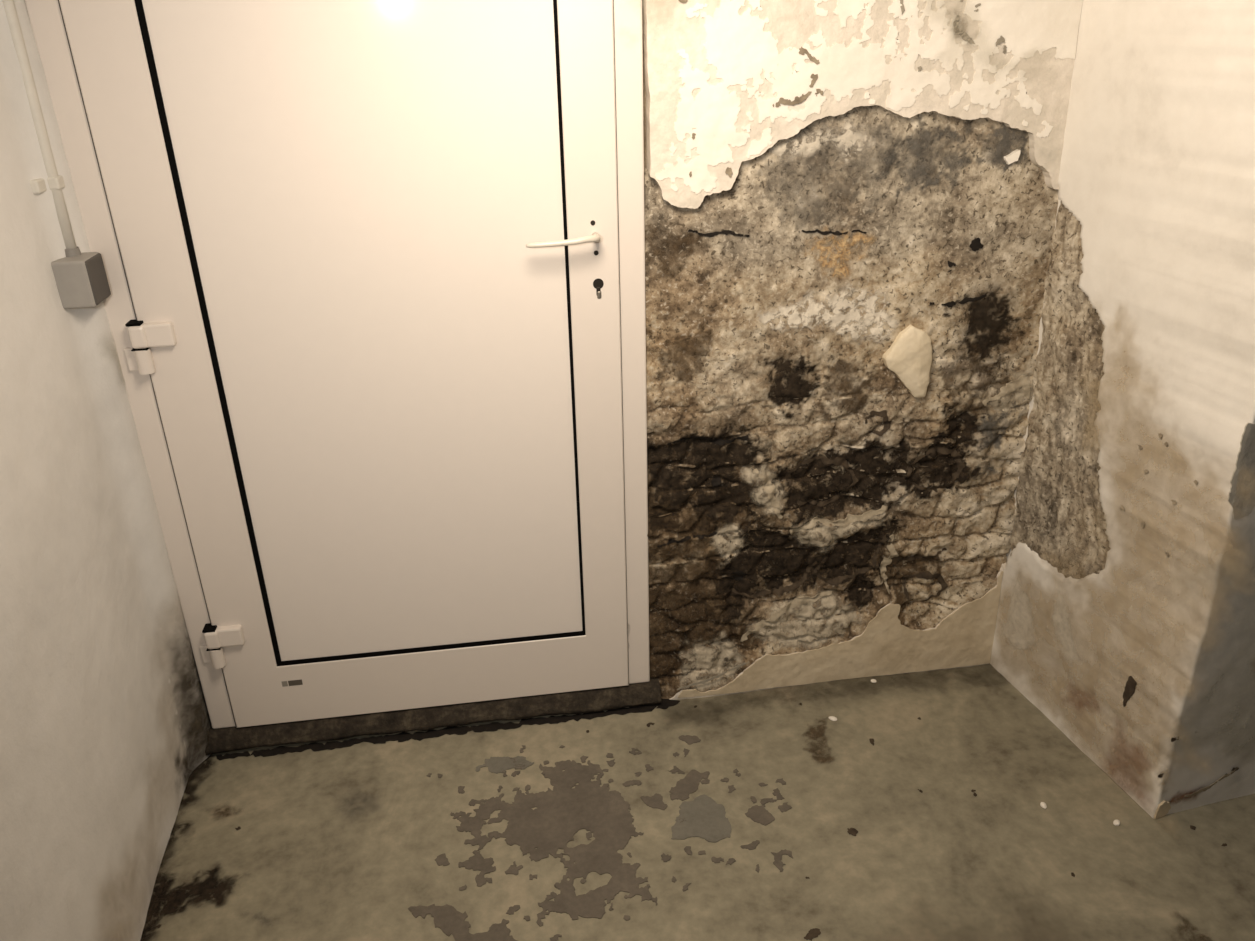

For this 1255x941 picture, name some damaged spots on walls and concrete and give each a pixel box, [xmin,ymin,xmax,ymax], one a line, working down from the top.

damp [772,116,1028,196]
spalling [644,0,1111,708]
damp [1001,426,1231,785]
peeling [1228,423,1255,520]
damp [140,646,234,941]